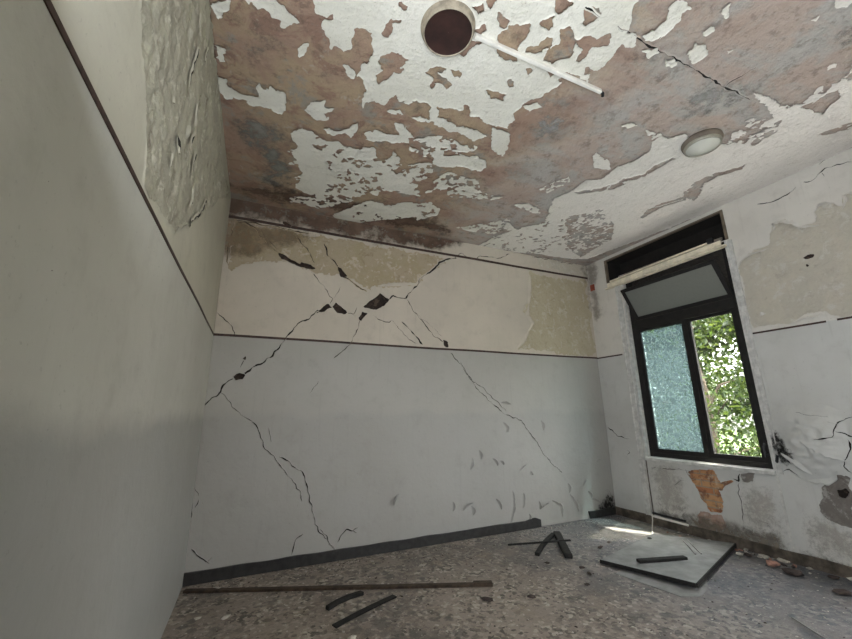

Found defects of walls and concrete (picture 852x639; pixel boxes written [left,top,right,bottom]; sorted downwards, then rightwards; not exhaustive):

crack [584,6,756,100]
peeling [141,0,852,278]
crack [189,188,207,224]
damp [225,120,459,256]
peeling [228,221,446,321]
crack [205,219,562,555]
crack [795,409,852,474]
flaking render [688,469,755,530]
flaking render [781,453,852,528]